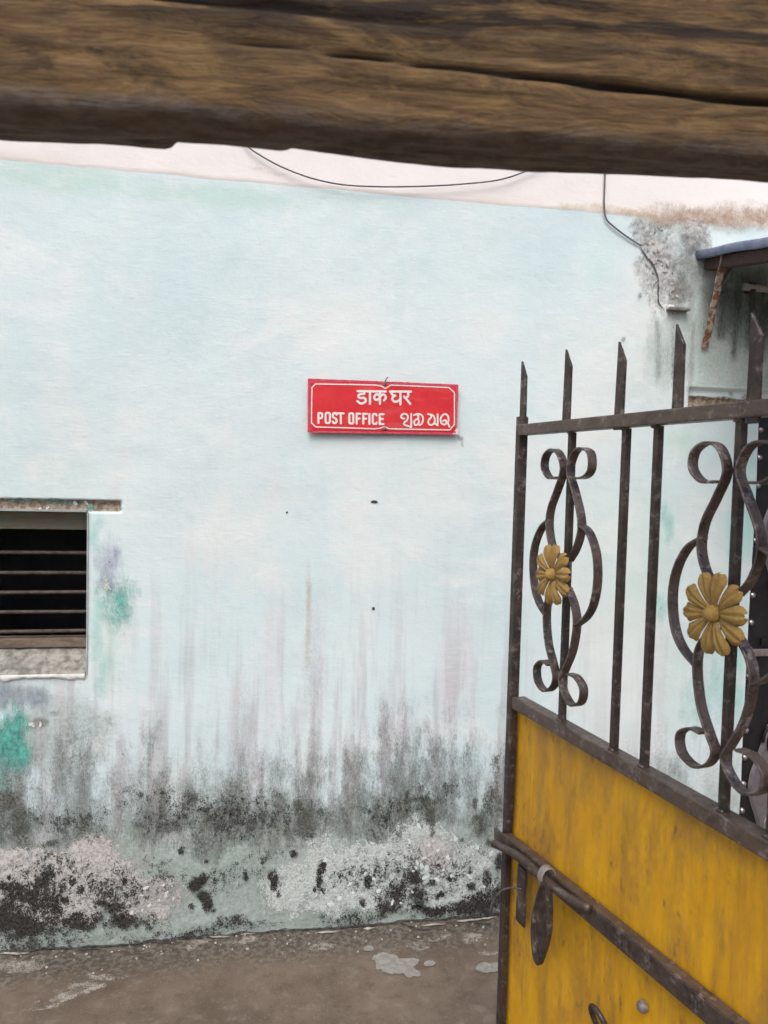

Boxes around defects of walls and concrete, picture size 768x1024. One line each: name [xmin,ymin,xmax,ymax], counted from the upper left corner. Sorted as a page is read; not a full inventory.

damp [0,736,505,973]
damp [32,974,128,1011]